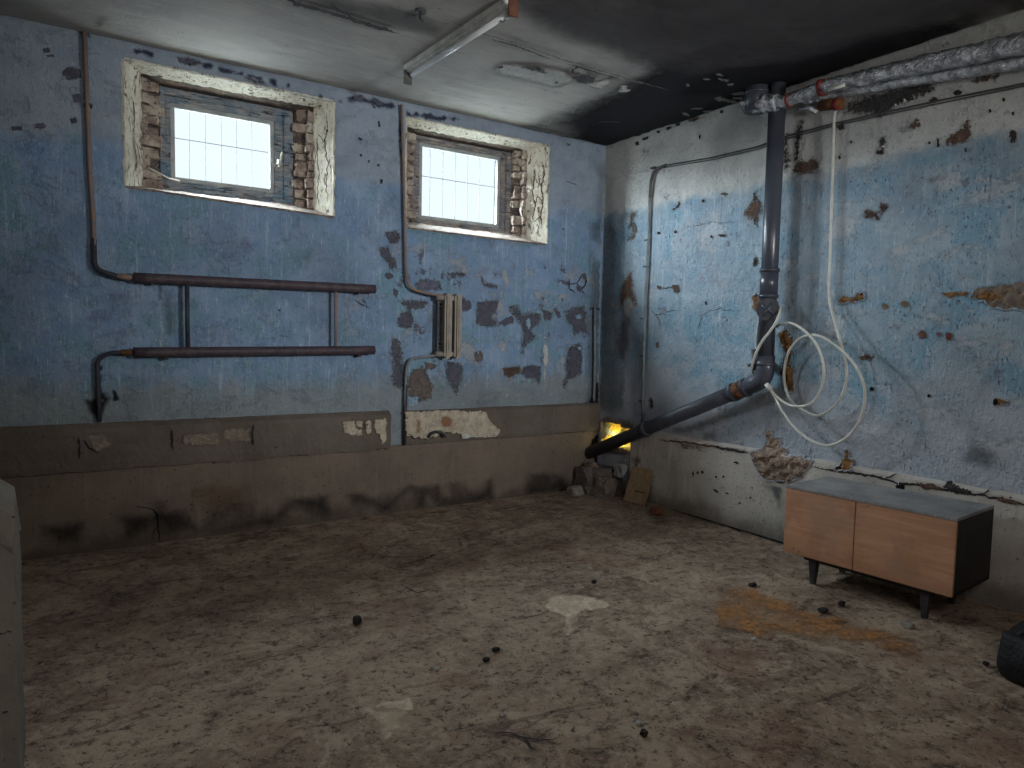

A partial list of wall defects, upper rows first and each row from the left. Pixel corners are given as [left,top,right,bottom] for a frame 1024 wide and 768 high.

peeling [783,119,819,175]
crack [532,163,564,230]
peeling [742,192,763,227]
peeling [863,202,888,221]
peeling [379,132,589,419]
flaking render [941,279,1024,313]
flaking render [777,329,796,394]
peeling [343,418,387,444]
crack [661,439,748,453]
flaking render [733,427,815,484]
crack [811,466,1024,505]